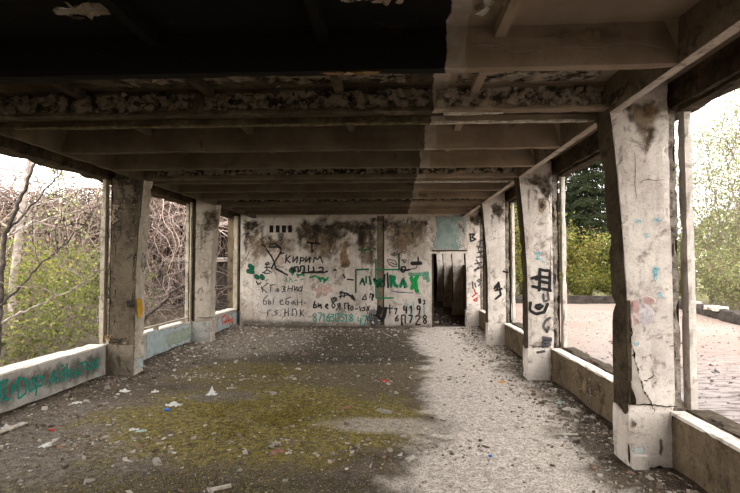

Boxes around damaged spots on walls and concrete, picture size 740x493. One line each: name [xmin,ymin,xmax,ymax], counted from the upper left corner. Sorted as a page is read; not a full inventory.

peeling [56,2,111,20]
peeling [114,79,189,88]
peeling [203,71,411,89]
peeling [436,70,605,108]
leakage [626,102,664,150]
leakage [527,171,554,204]
leakage [244,218,427,264]
crack [629,317,678,412]